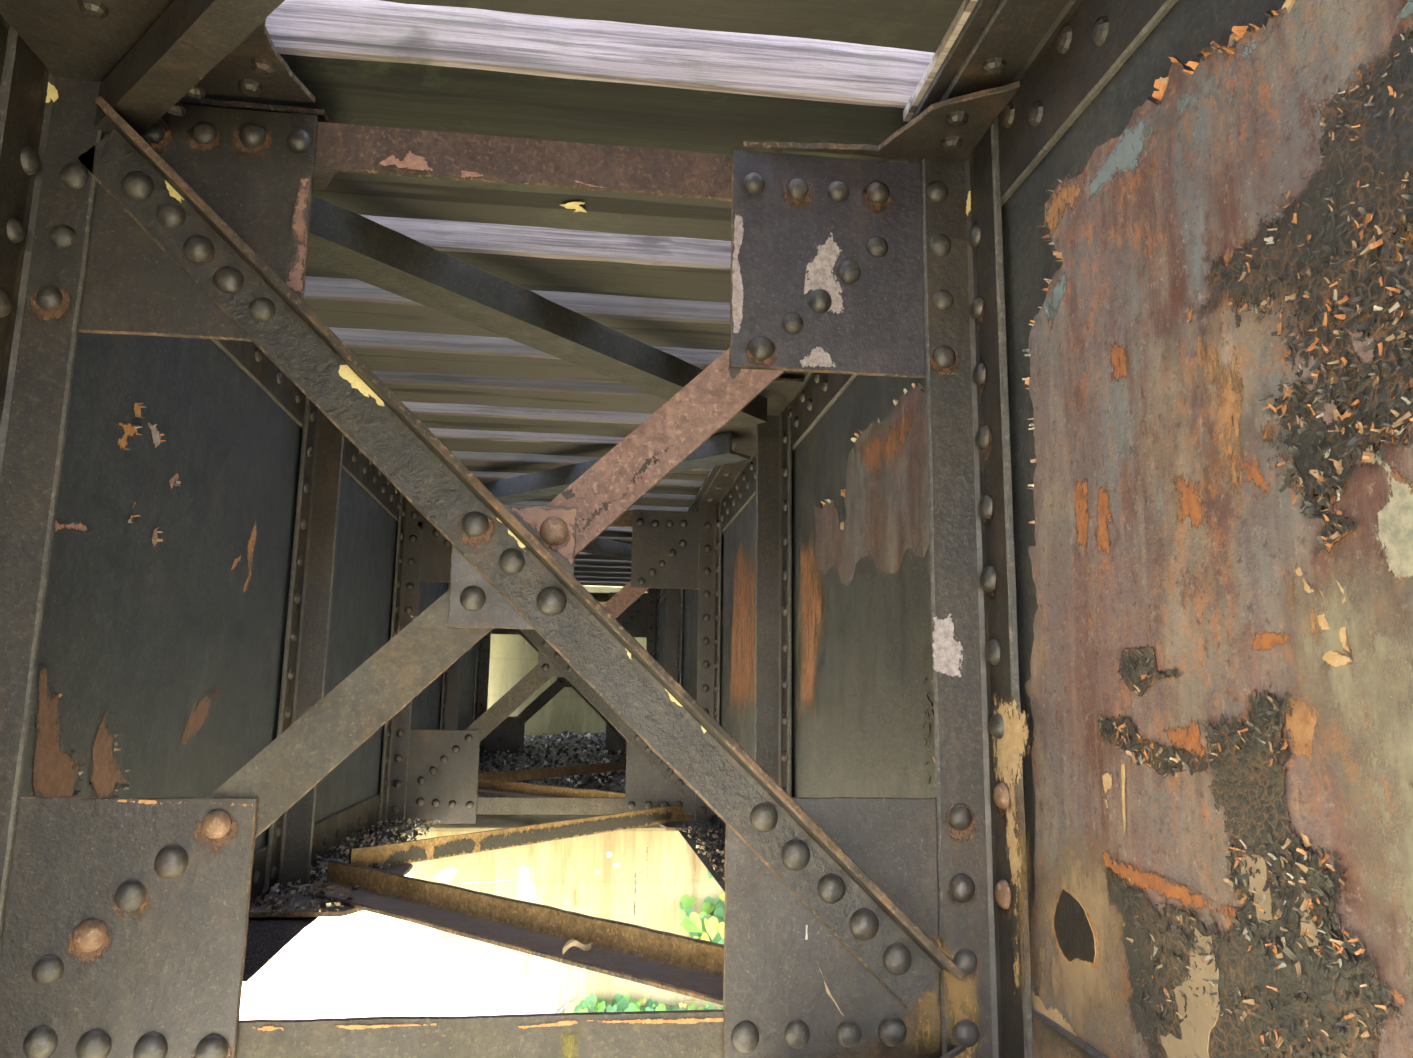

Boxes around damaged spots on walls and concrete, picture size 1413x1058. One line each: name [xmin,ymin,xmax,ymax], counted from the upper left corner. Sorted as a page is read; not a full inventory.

rust [1043,182,1083,231]
peeling [732,215,744,333]
peeling [804,232,844,314]
peeling [799,346,837,368]
peeling [55,520,91,533]
rust [1075,479,1113,555]
peeling [1022,0,1413,1058]
rust [799,536,822,707]
peeling [32,668,130,798]
rust [1131,718,1207,772]
rust [1282,695,1320,775]
rust [1103,852,1239,936]